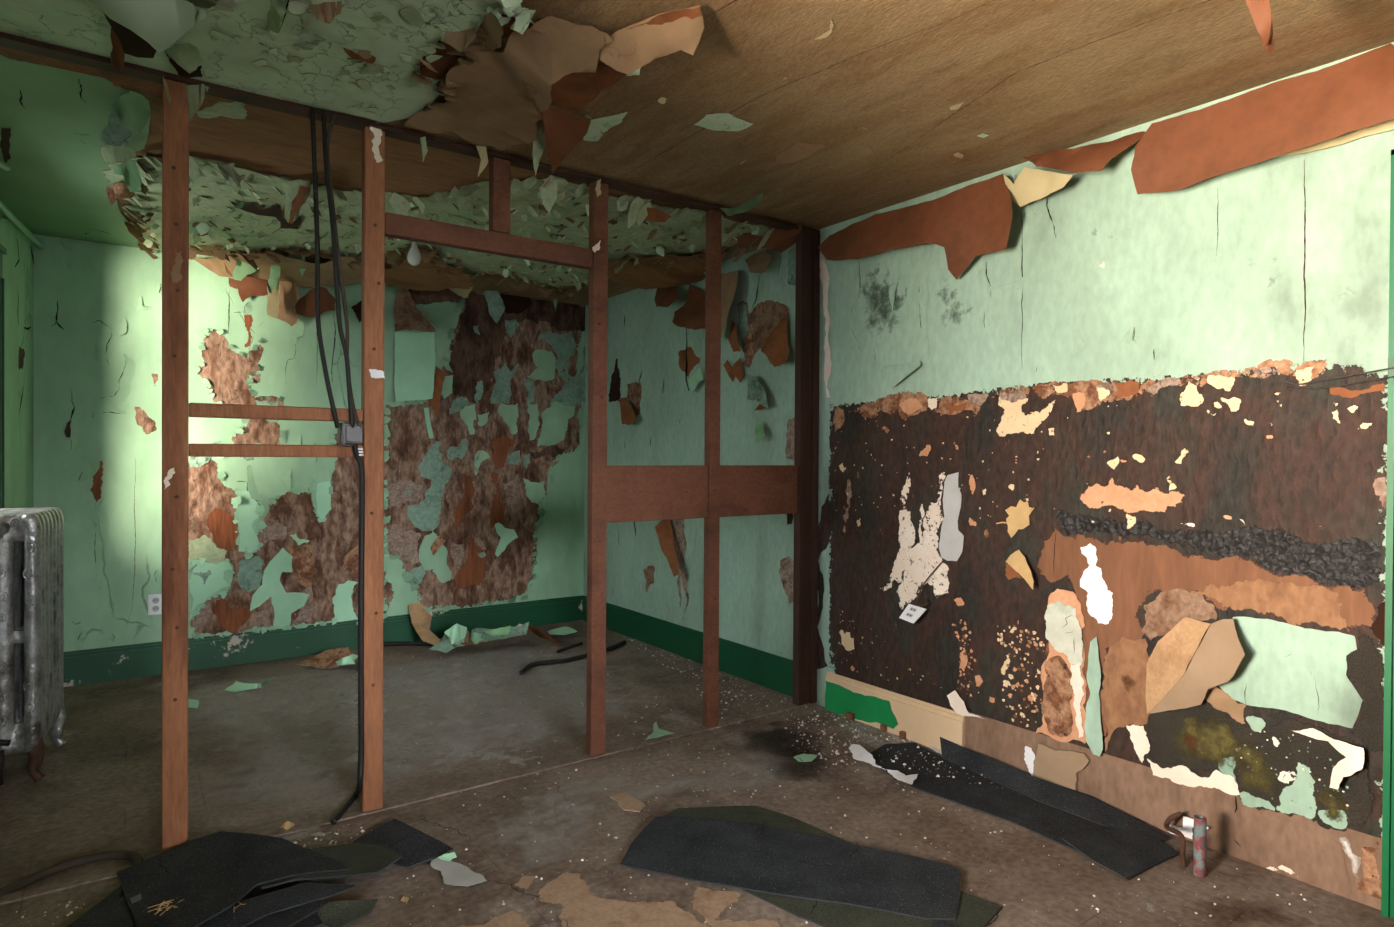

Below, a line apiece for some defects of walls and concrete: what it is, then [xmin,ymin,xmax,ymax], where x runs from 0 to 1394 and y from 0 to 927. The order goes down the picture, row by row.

peeling [87,0,242,74]
peeling [100,90,162,259]
peeling [510,175,589,249]
peeling [608,190,791,443]
peeling [188,156,362,639]
peeling [383,237,589,645]
peeling [939,472,964,561]
peeling [1080,478,1185,513]
peeling [1005,550,1034,589]
peeling [947,691,987,720]
peeling [1146,617,1245,714]
peeling [1294,728,1365,790]